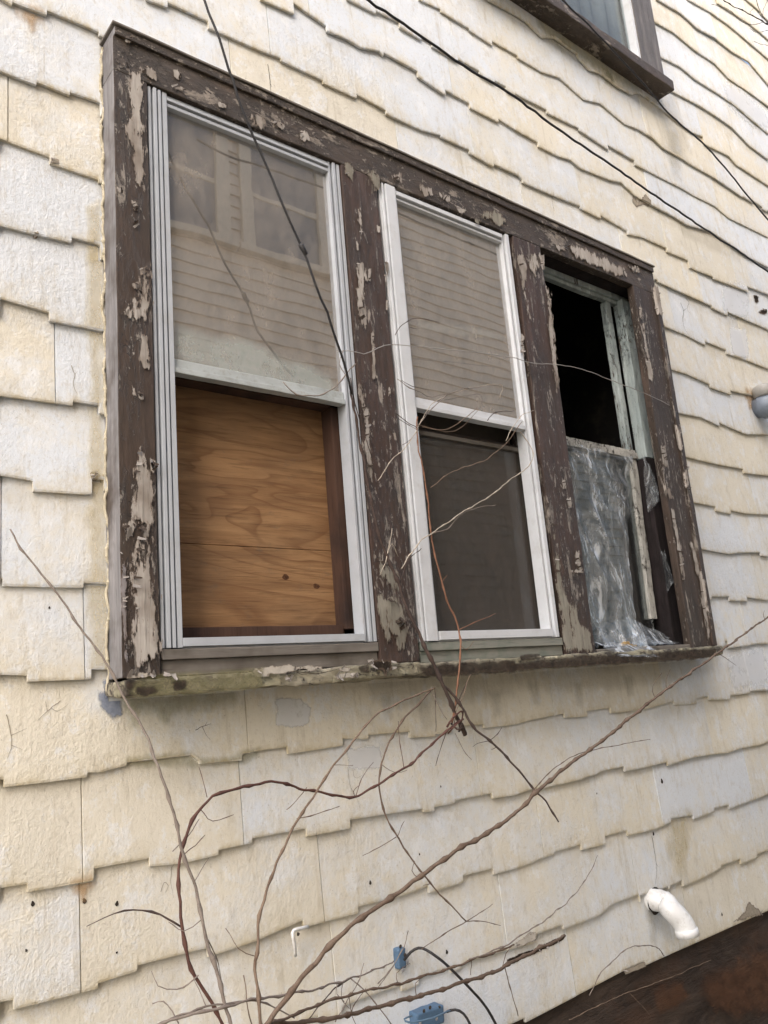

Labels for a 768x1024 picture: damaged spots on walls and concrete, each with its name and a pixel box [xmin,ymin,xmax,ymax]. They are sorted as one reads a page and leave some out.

peeling [117,60,157,192]
peeling [251,113,285,129]
peeling [139,334,151,370]
peeling [355,208,389,482]
peeling [517,252,560,393]
peeling [556,245,640,277]
peeling [639,306,653,382]
peeling [120,445,178,680]
peeling [376,558,409,651]
peeling [551,522,593,654]
peeling [666,488,712,640]
peeling [254,664,359,681]